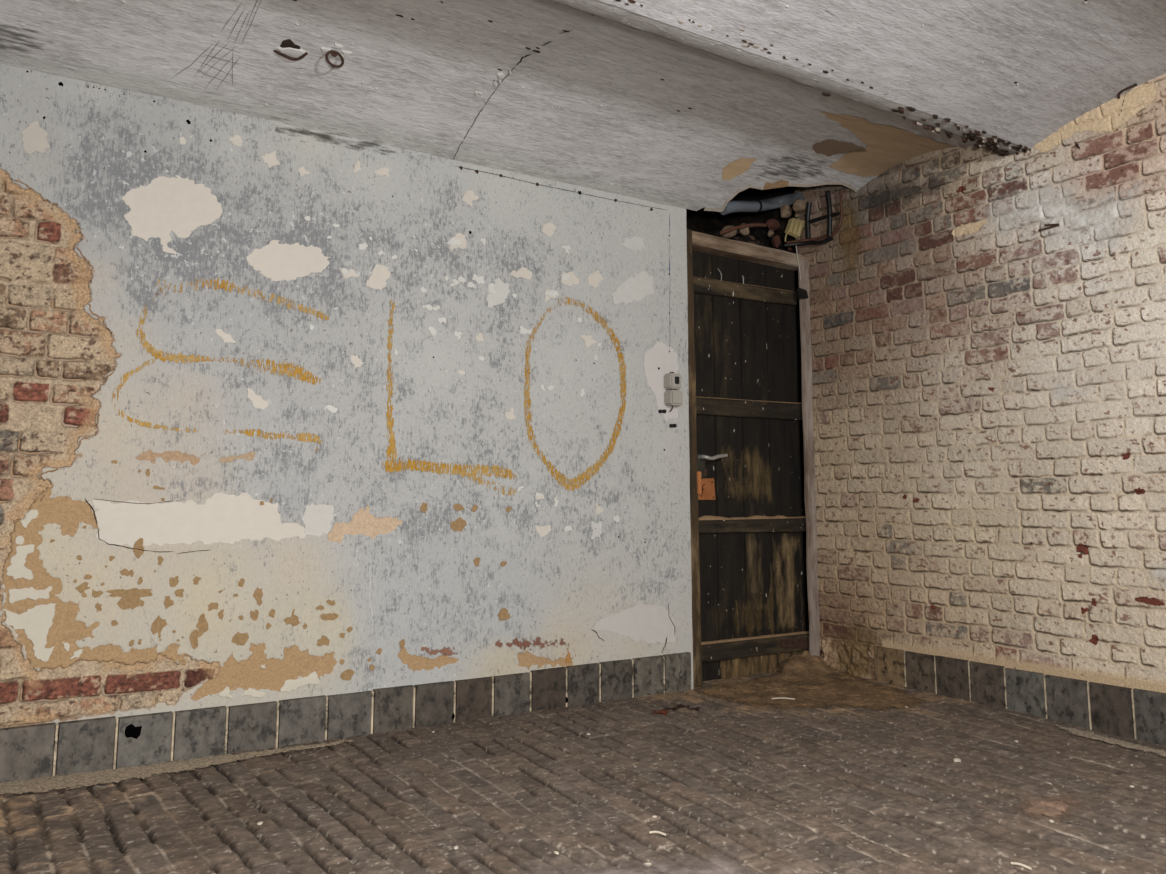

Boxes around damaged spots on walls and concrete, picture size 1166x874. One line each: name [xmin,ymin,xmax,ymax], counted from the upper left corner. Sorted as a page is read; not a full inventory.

spalling [273,39,352,61]
peeling [678,19,834,74]
crack [453,30,573,160]
peeling [704,79,1031,212]
flaking render [643,341,678,421]
flaking render [0,170,403,726]
peeling [450,503,478,531]
spalling [1076,544,1089,558]
flaking render [593,601,676,645]
spalling [1135,597,1165,606]
flaking render [398,639,459,671]
rust [495,637,572,663]